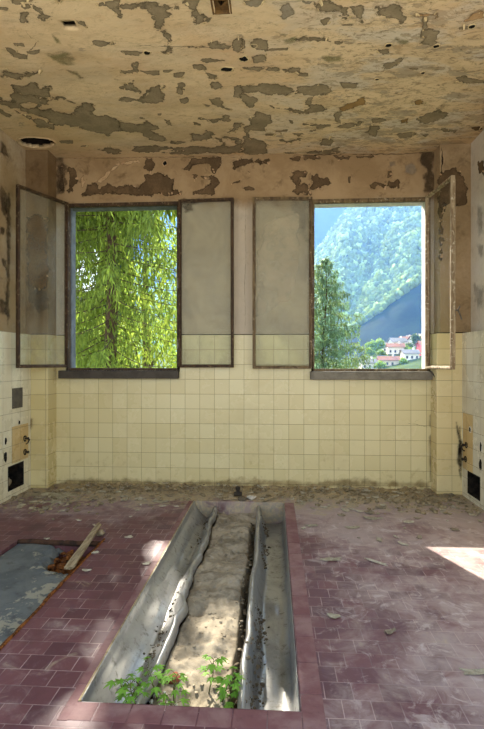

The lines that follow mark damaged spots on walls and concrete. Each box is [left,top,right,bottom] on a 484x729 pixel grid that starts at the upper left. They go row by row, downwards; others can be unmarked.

peeling [96,0,211,55]
peeling [375,4,440,45]
peeling [459,11,484,30]
peeling [0,58,387,197]
peeling [395,108,448,138]
damp [0,191,11,317]